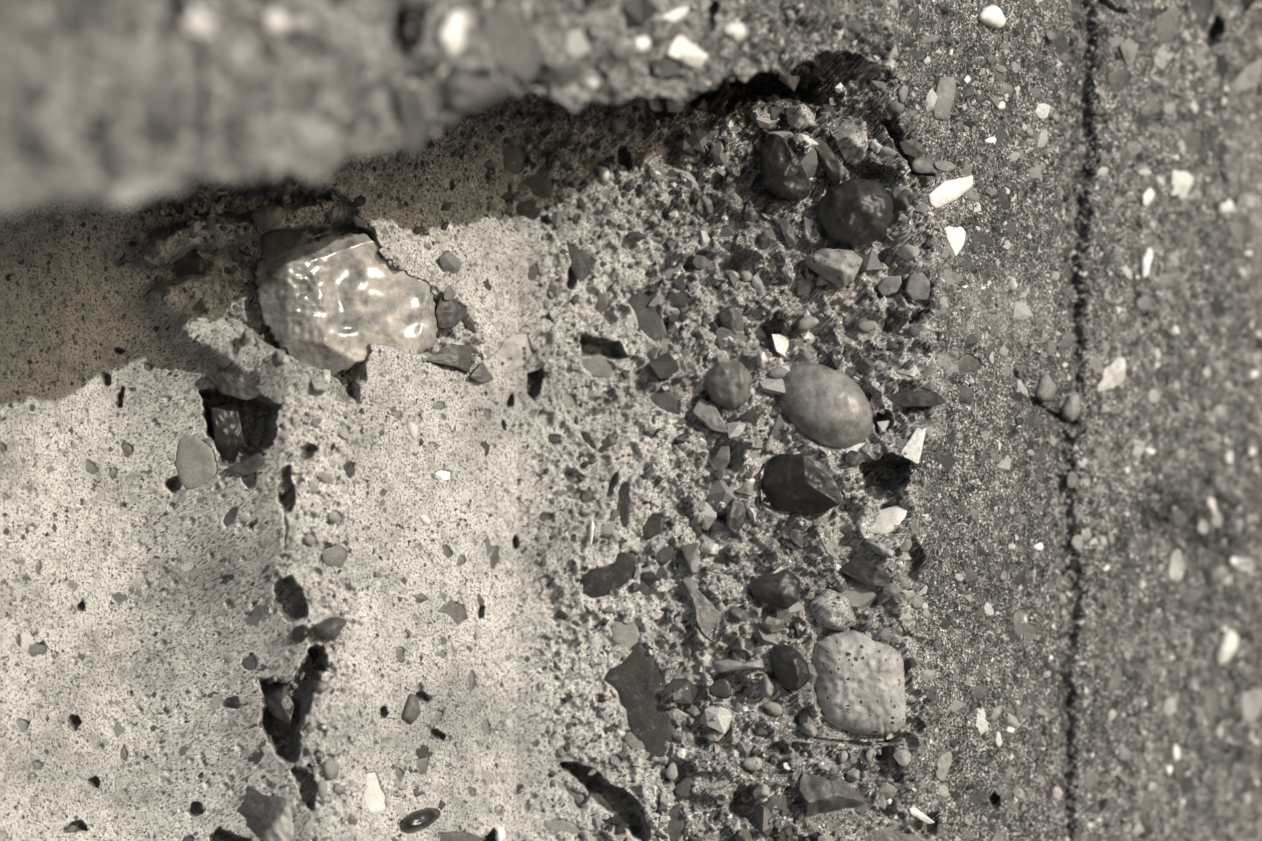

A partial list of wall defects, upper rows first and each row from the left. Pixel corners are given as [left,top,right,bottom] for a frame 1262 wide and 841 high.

spalling [0,119,532,841]
spalling [500,0,1074,841]
crack [1012,0,1129,841]
peeling [1072,518,1108,545]
peeling [1081,432,1262,841]
peeling [1096,127,1262,216]
peeling [1159,77,1214,134]
peeling [1201,292,1259,421]